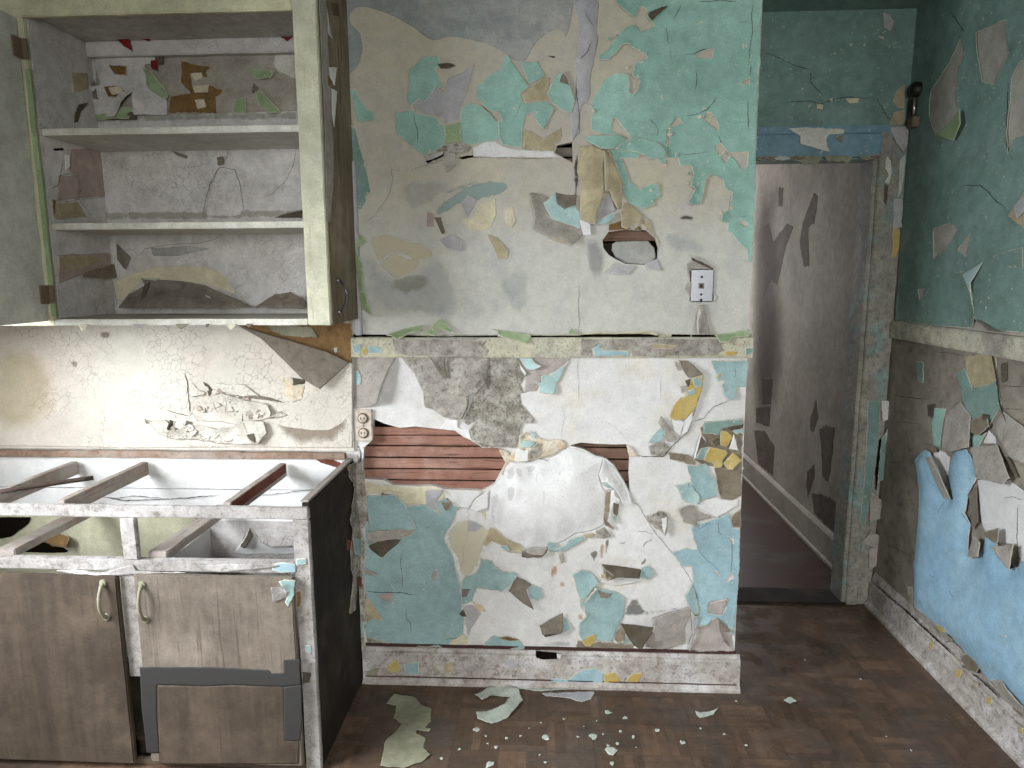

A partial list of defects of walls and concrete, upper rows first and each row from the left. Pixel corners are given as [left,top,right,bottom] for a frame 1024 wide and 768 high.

peeling [327,0,1024,333]
crack [168,373,205,416]
peeling [144,377,318,445]
peeling [386,317,455,340]
peeling [316,419,637,649]
flaking render [519,358,571,394]
peeling [568,256,775,636]
peeling [806,401,836,532]
peeling [860,400,889,570]
peeling [907,354,1024,734]